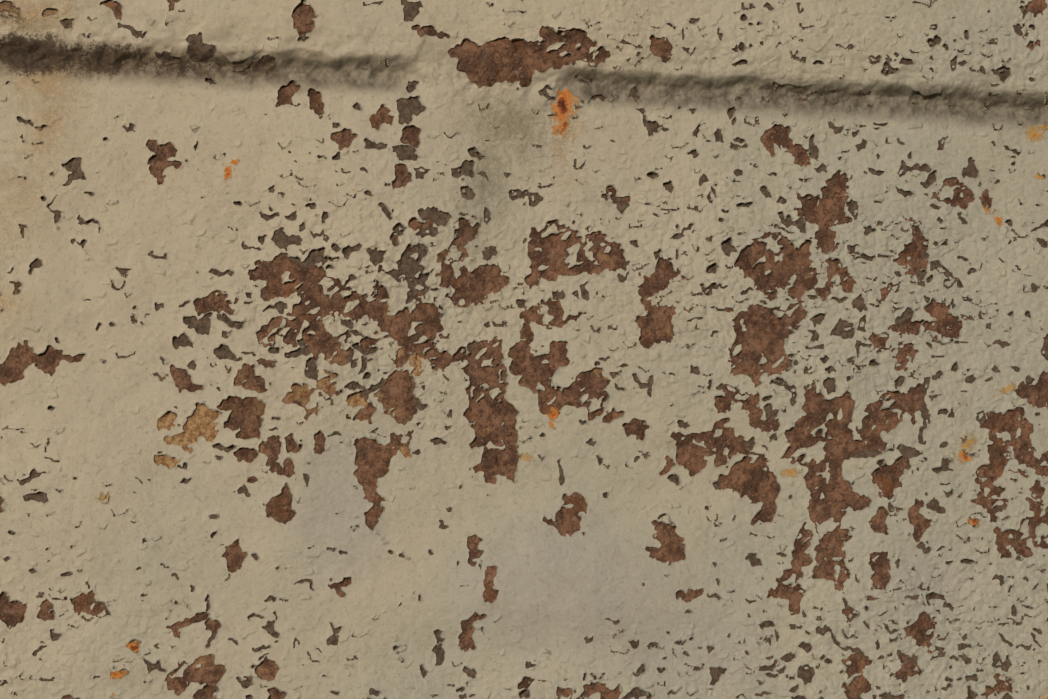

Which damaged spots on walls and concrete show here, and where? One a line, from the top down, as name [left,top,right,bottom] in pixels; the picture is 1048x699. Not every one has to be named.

peeling [162,0,185,26]
peeling [286,0,322,42]
peeling [150,30,280,81]
peeling [397,0,832,116]
corrosion [549,88,584,138]
peeling [0,337,87,389]
peeling [109,76,1048,699]
peeling [54,689,81,699]